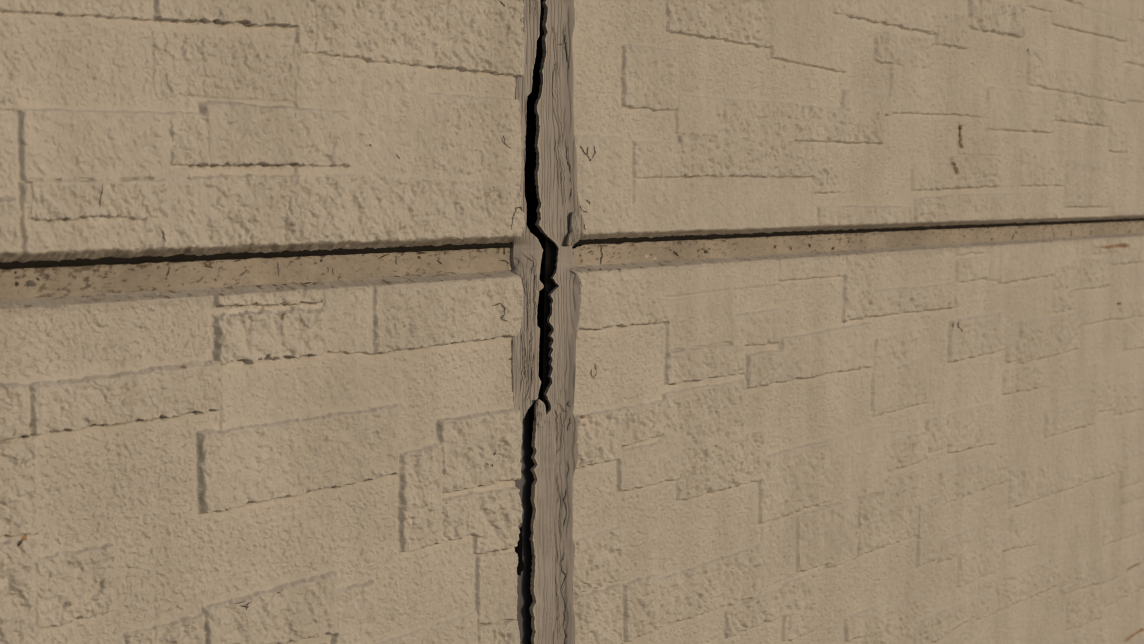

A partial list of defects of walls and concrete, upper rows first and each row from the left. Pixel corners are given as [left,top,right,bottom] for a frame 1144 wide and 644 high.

crack [493,0,603,644]